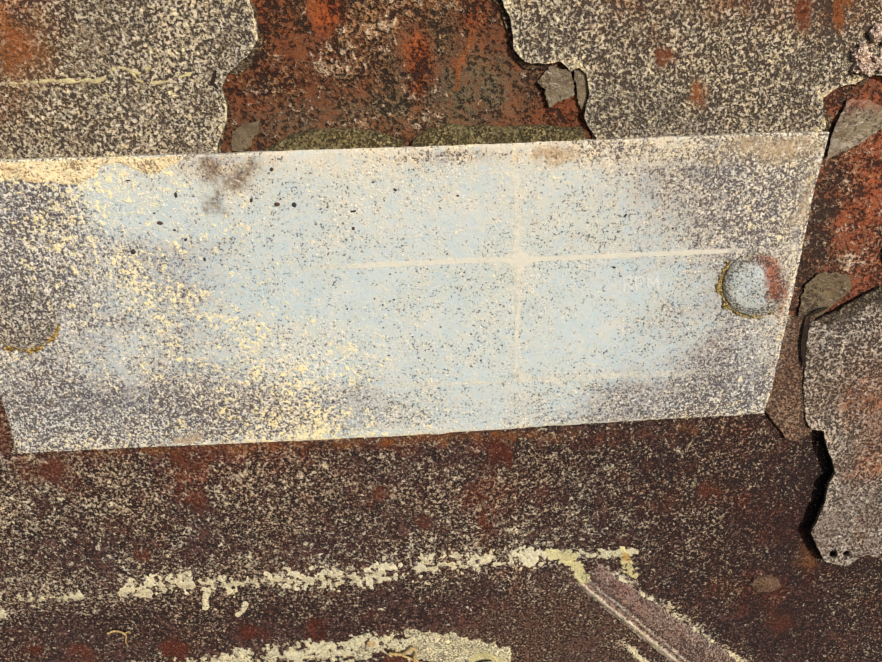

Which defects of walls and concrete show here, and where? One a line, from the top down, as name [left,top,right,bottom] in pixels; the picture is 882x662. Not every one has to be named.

spalling [217,0,596,153]
rust [655,50,673,64]
peeling [788,75,882,566]